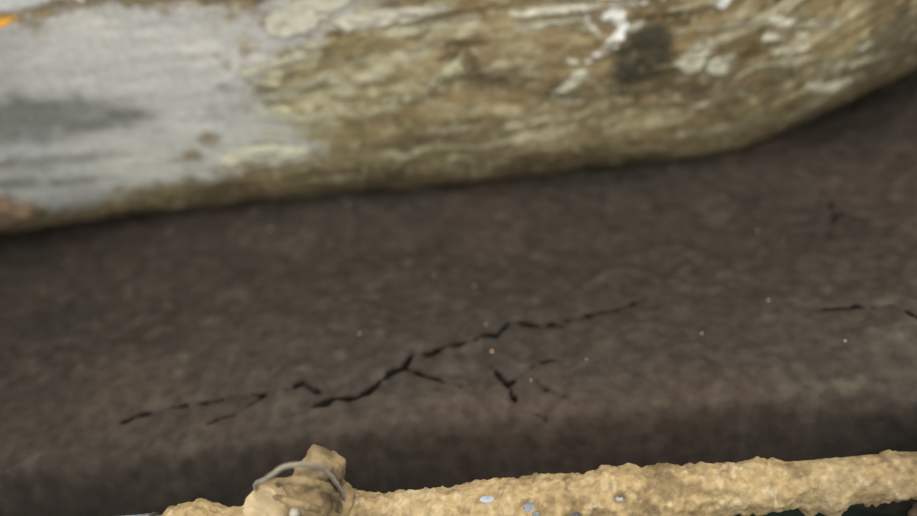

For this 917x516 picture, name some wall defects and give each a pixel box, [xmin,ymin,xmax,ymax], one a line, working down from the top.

peeling [263,0,446,38]
peeling [509,0,648,43]
peeling [672,15,895,93]
peeling [555,52,601,105]
water stain [0,99,142,138]
peeling [217,144,309,167]
crack [287,300,645,408]
crack [121,394,266,425]